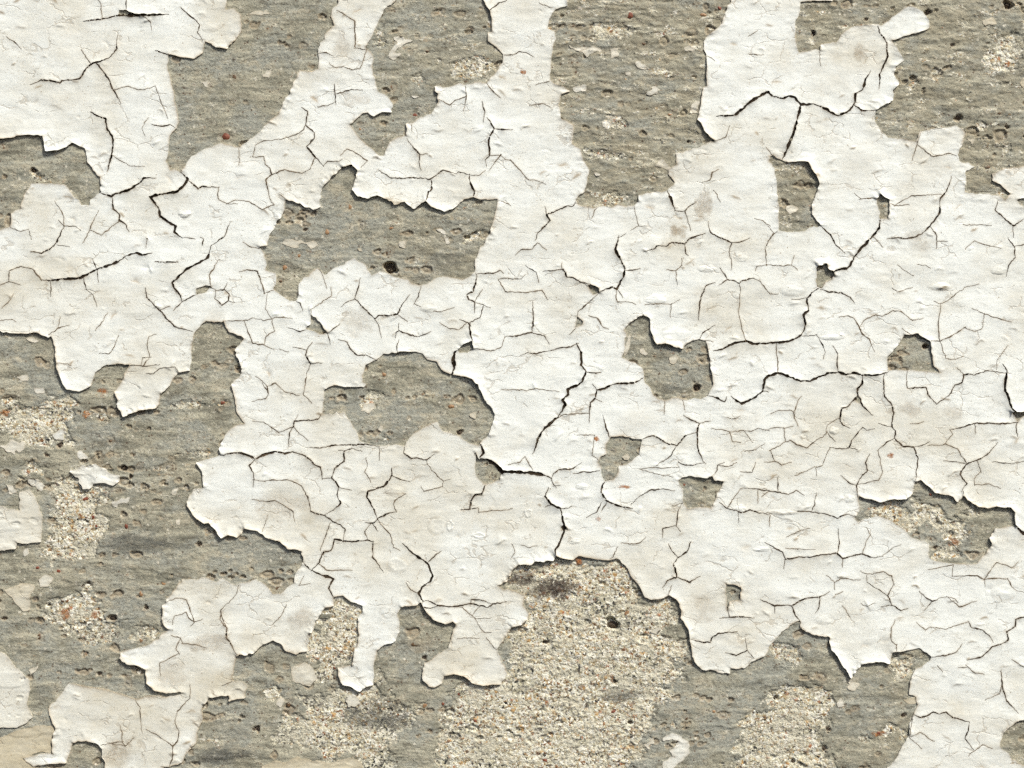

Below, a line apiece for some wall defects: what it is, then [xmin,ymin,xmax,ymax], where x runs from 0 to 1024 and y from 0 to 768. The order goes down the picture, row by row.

peeling [166,0,339,172]
crack [0,0,545,332]
peeling [260,165,498,301]
peeling [548,0,731,208]
crack [715,27,889,160]
peeling [795,0,1024,206]
crack [220,176,1024,674]
crack [102,688,191,767]
peeling [0,321,303,768]
crack [159,585,239,676]
peeling [165,556,931,768]
crack [909,711,993,755]